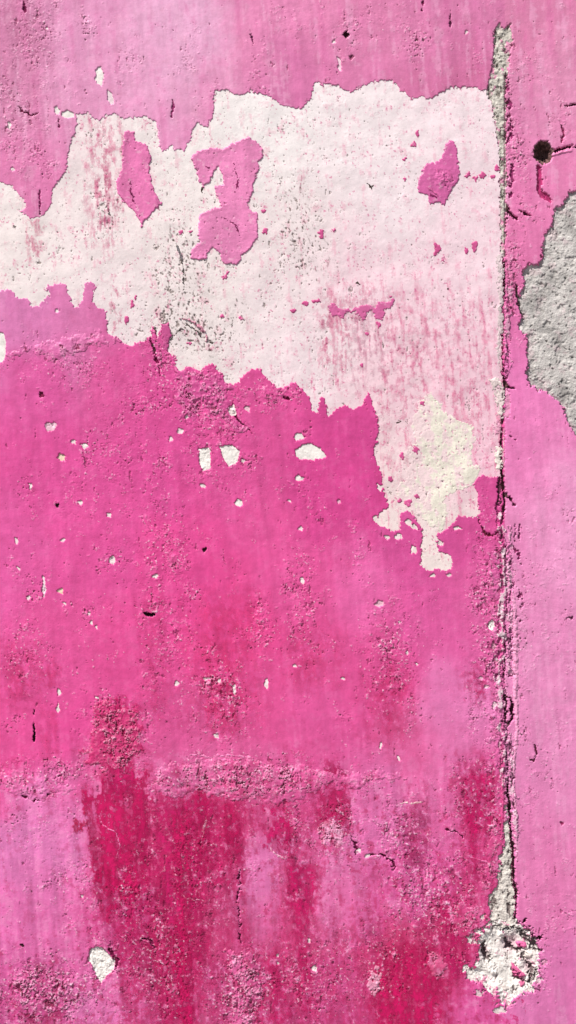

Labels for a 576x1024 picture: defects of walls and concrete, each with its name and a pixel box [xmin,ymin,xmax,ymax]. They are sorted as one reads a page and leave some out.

peeling [0,67,504,577]
spalling [516,192,576,435]
crack [445,23,530,929]
peeling [88,947,115,983]
spalling [460,914,548,1014]